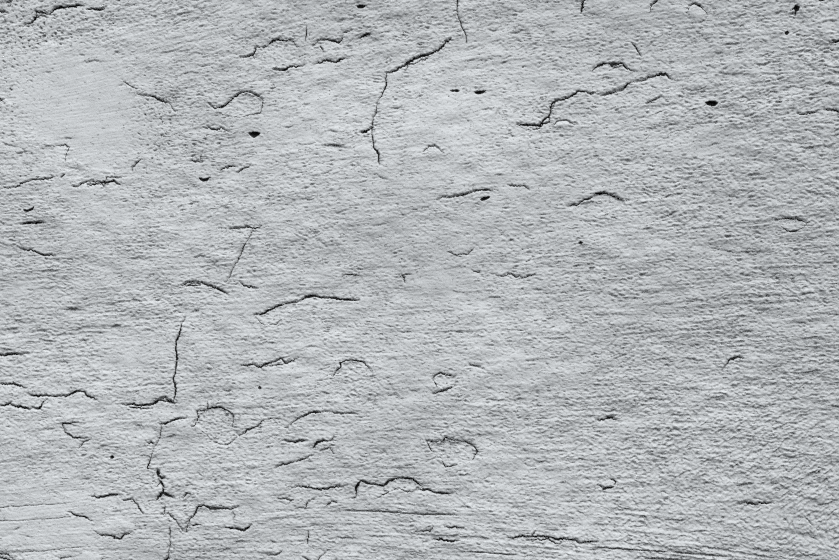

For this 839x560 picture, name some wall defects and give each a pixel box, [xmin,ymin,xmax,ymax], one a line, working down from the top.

crack [23,0,119,27]
crack [361,0,467,165]
crack [517,43,671,130]
crack [184,226,261,293]
crack [0,382,97,409]
crack [91,319,188,560]